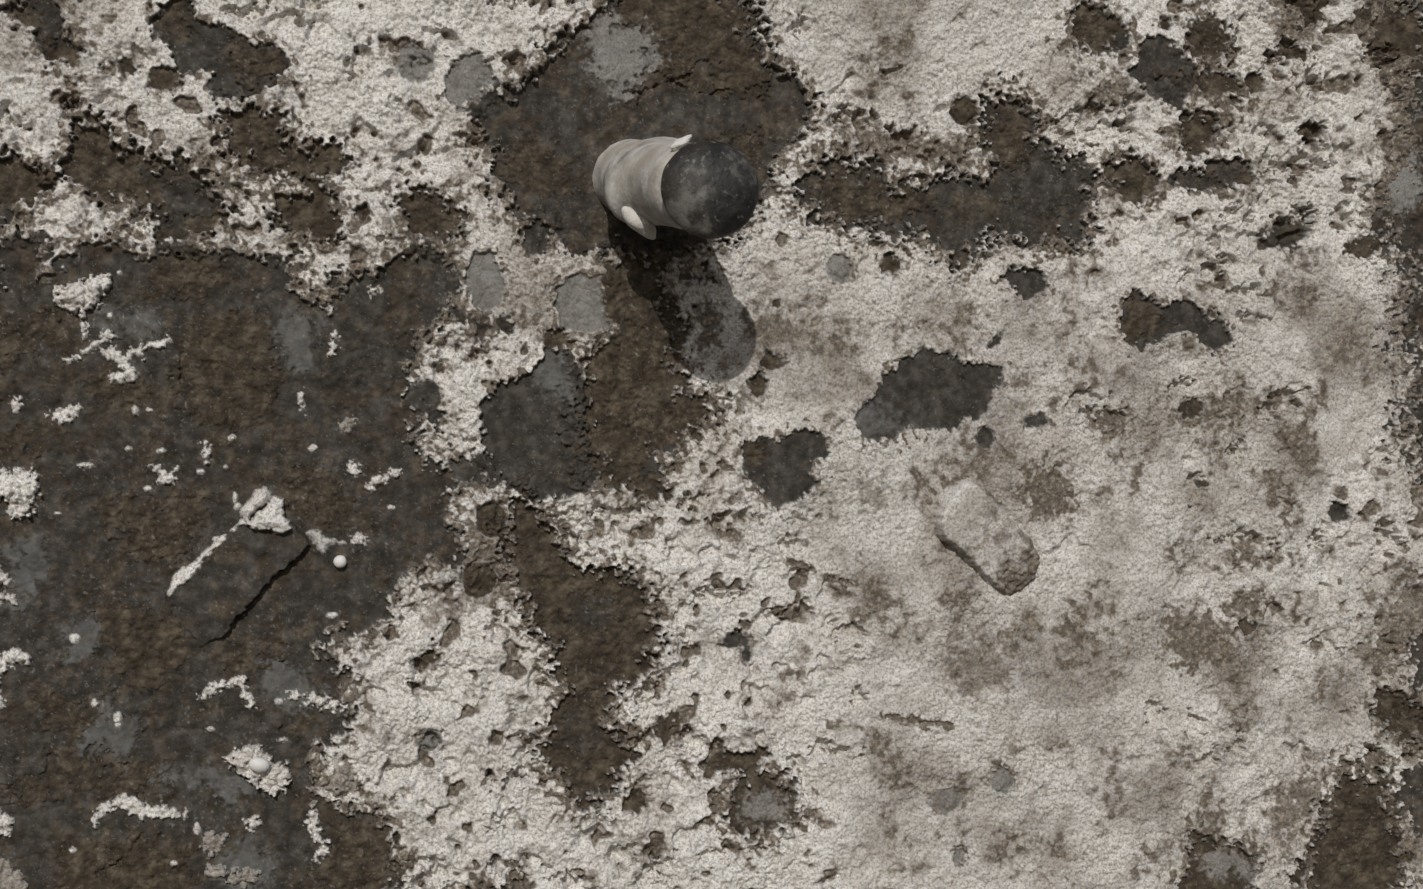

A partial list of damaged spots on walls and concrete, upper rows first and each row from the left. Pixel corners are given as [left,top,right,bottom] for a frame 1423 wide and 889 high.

spalling [1065,0,1132,59]
spalling [1269,0,1340,66]
spalling [781,12,1267,275]
spalling [1296,121,1328,146]
hole [826,255,855,286]
spalling [1342,0,1423,495]
spalling [1119,289,1234,357]
spalling [854,331,1006,451]
spalling [0,0,831,889]
spalling [1284,627,1423,889]
spalling [1175,829,1265,889]